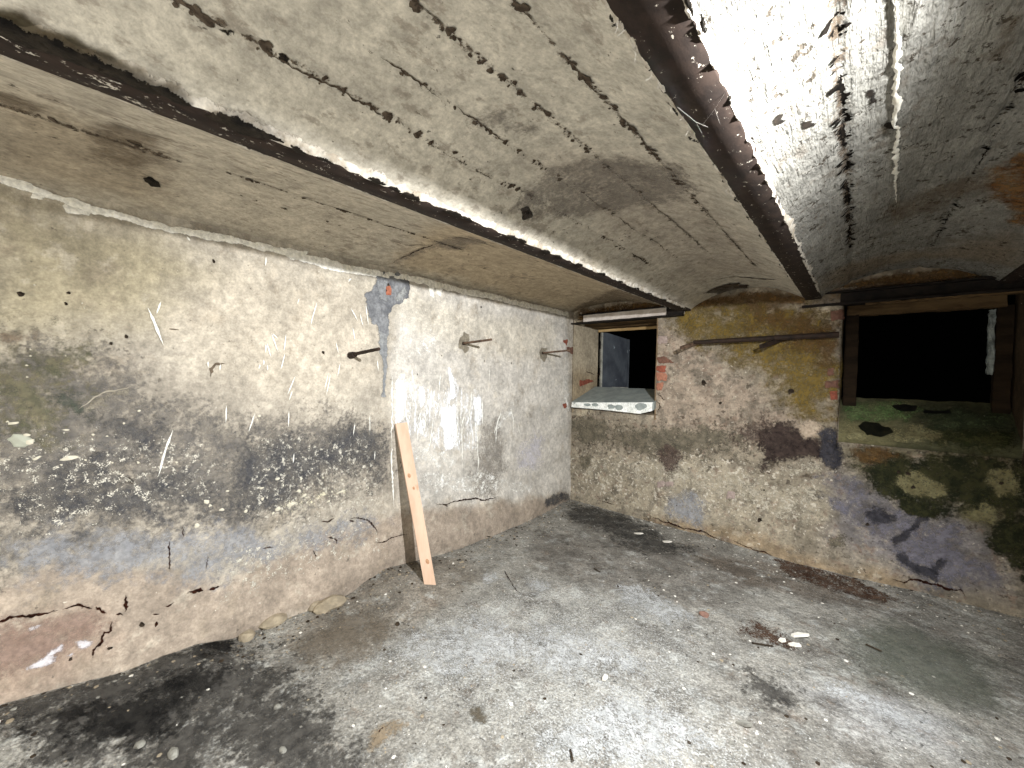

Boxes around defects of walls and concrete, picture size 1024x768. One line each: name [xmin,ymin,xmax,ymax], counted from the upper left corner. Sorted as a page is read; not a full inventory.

damp [0,331,397,582]
damp [571,291,1024,589]
crack [437,497,494,506]
crack [0,597,129,655]
damp [613,579,705,625]
crack [893,579,965,596]